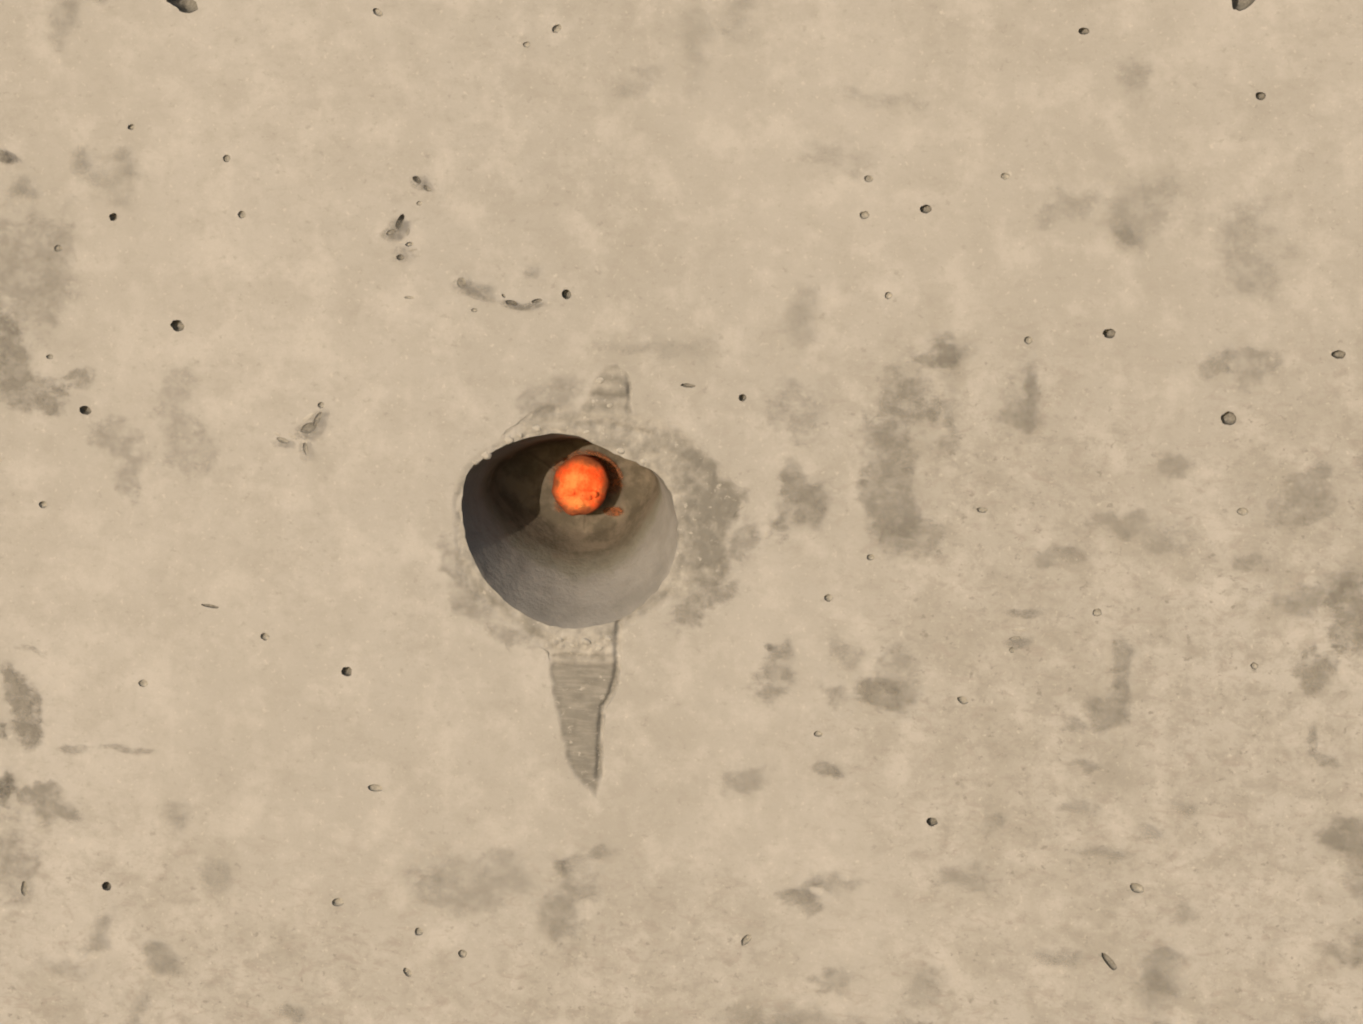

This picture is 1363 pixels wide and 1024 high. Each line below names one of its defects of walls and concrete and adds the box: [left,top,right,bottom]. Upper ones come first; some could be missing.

rust [554,451,623,516]
spalling [450,363,752,657]